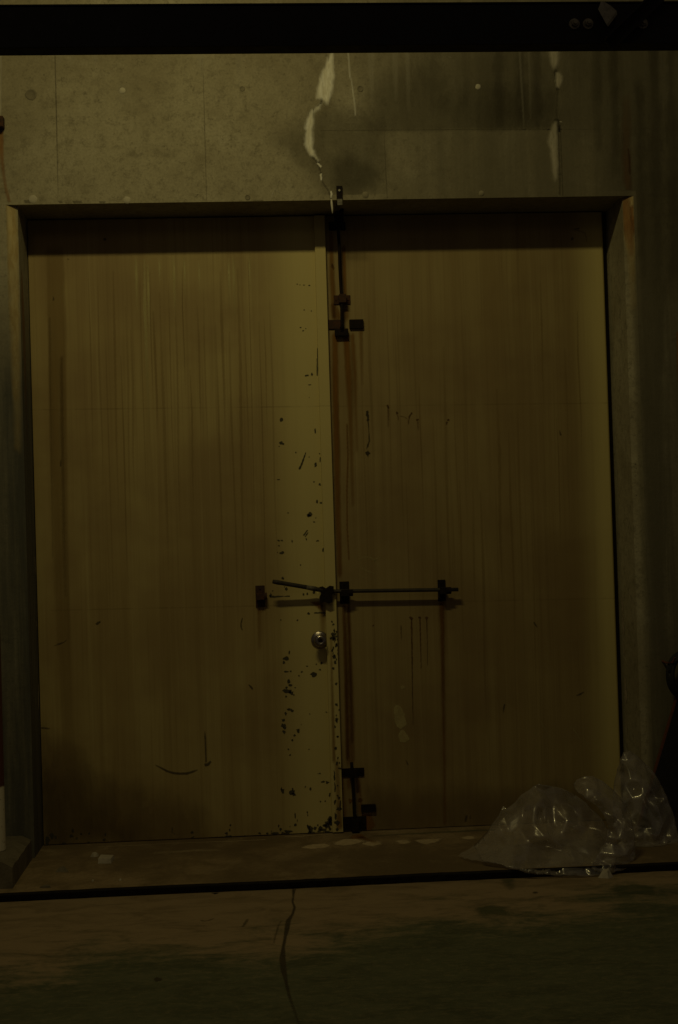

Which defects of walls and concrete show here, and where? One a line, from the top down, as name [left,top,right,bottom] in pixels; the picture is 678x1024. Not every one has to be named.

crack [280,889,296,998]